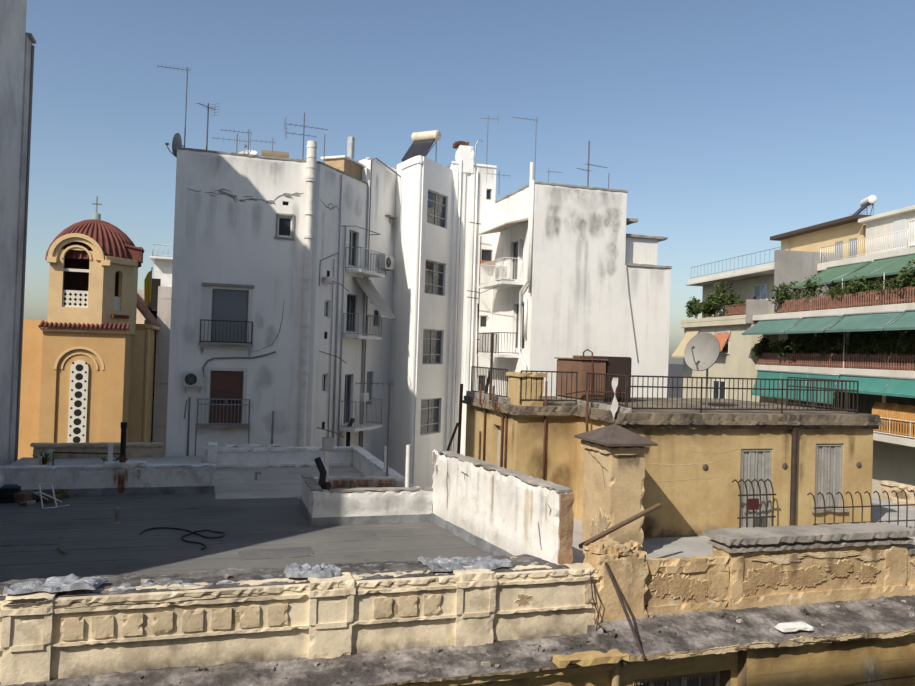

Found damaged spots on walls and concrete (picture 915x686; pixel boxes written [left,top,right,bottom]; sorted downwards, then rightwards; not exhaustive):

crack [187,188,339,210]
flaking render [647,568,709,604]
flaking render [741,550,885,597]